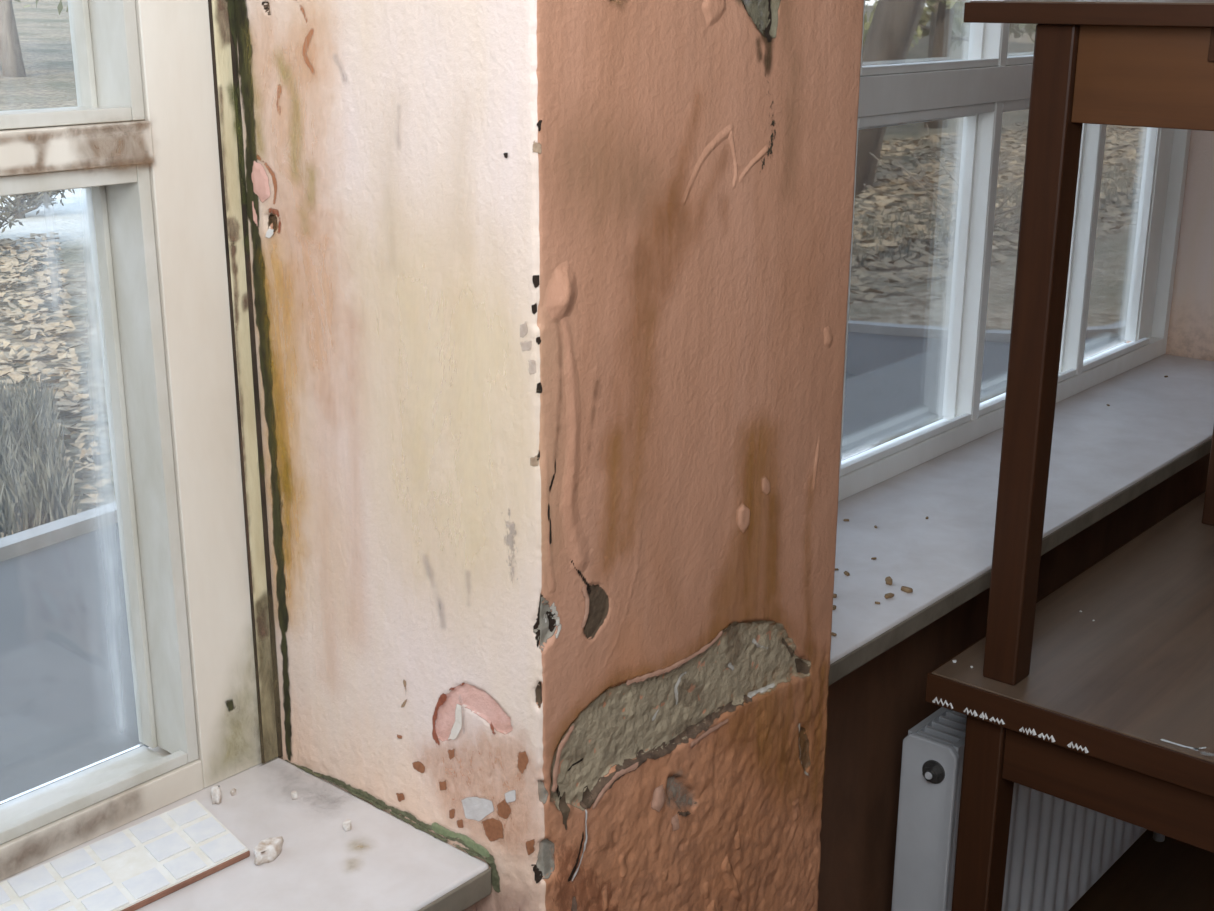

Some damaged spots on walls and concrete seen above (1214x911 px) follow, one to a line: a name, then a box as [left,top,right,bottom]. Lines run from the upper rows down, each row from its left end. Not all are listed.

peeling [742,0,780,169]
water stain [226,0,299,761]
spalling [533,594,561,651]
peeling [432,682,513,745]
flaking render [538,620,811,831]